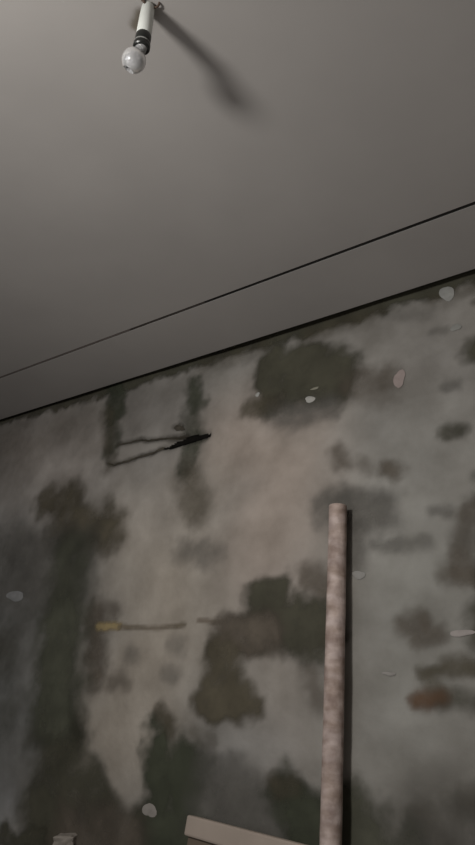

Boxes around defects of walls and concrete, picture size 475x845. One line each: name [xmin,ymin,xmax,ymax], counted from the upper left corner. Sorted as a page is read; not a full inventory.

flaking render [439,287,454,301]
water stain [0,269,475,454]
crack [107,425,211,466]
water stain [302,571,327,599]
water stain [0,482,143,845]
rust [419,660,475,679]
rust [410,693,445,708]
flaking render [142,803,157,817]